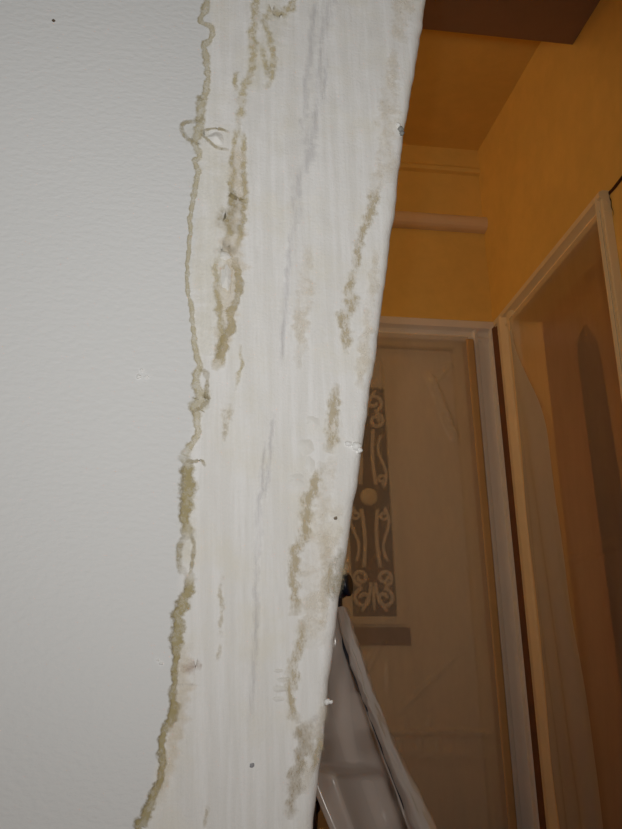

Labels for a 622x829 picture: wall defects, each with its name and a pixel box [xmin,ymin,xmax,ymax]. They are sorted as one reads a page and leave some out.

water stain [181,0,225,149]
water stain [185,203,209,449]
water stain [215,269,243,361]
water stain [179,459,204,527]
water stain [135,585,194,829]